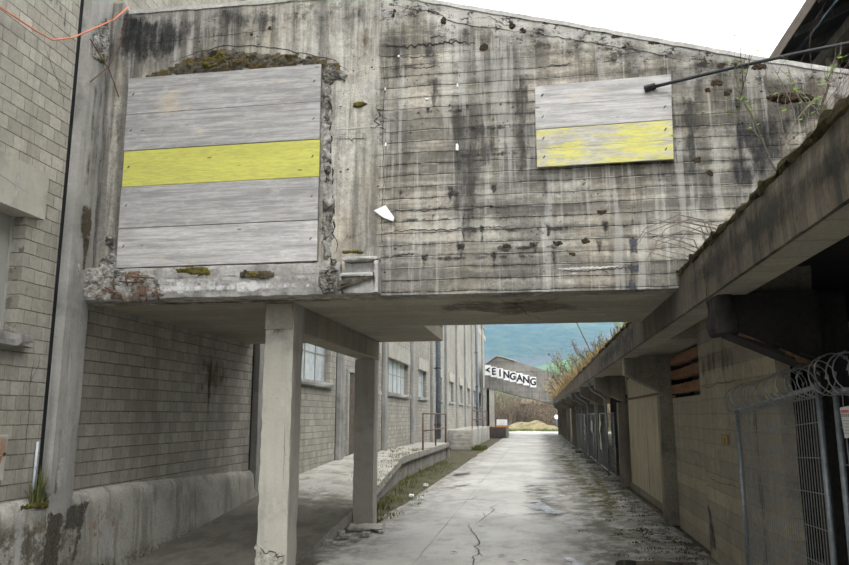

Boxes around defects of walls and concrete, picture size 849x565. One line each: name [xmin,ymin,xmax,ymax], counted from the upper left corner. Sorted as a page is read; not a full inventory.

spalling [91,18,111,63]
damp [516,78,528,168]
spalling [145,48,373,295]
damp [448,105,494,234]
spalling [83,235,164,304]
damp [43,501,89,565]
spalling [254,544,284,565]
crack [448,496,495,565]